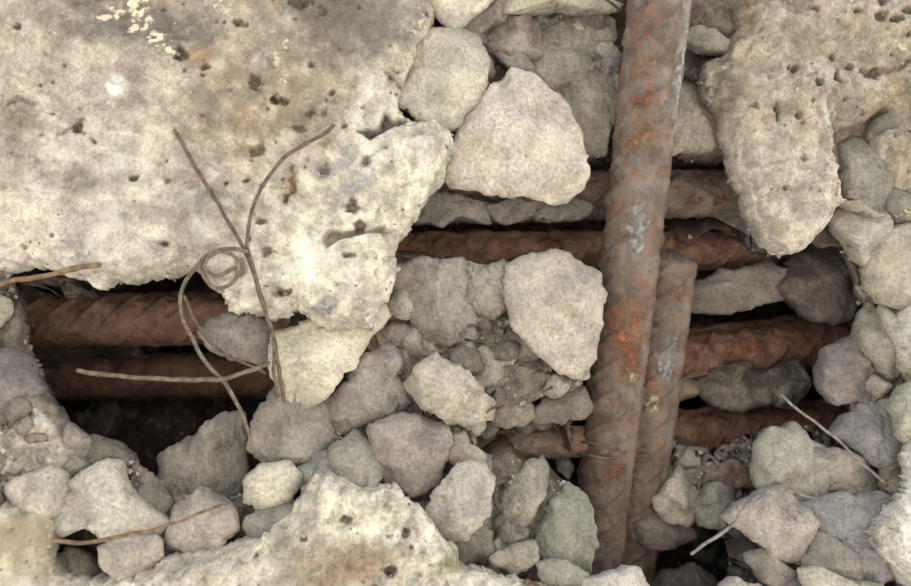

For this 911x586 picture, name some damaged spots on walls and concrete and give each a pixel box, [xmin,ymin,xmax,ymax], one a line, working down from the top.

water stain [61,0,218,42]
peeling [93,0,188,61]
peeling [273,39,290,84]
spalling [831,98,907,190]
spalling [343,0,882,586]
spalling [0,264,335,517]
spalling [317,372,347,416]
spalling [332,418,368,440]
spalling [865,372,911,417]
spalling [41,515,113,585]
spalling [137,469,560,586]
spalling [862,440,911,586]